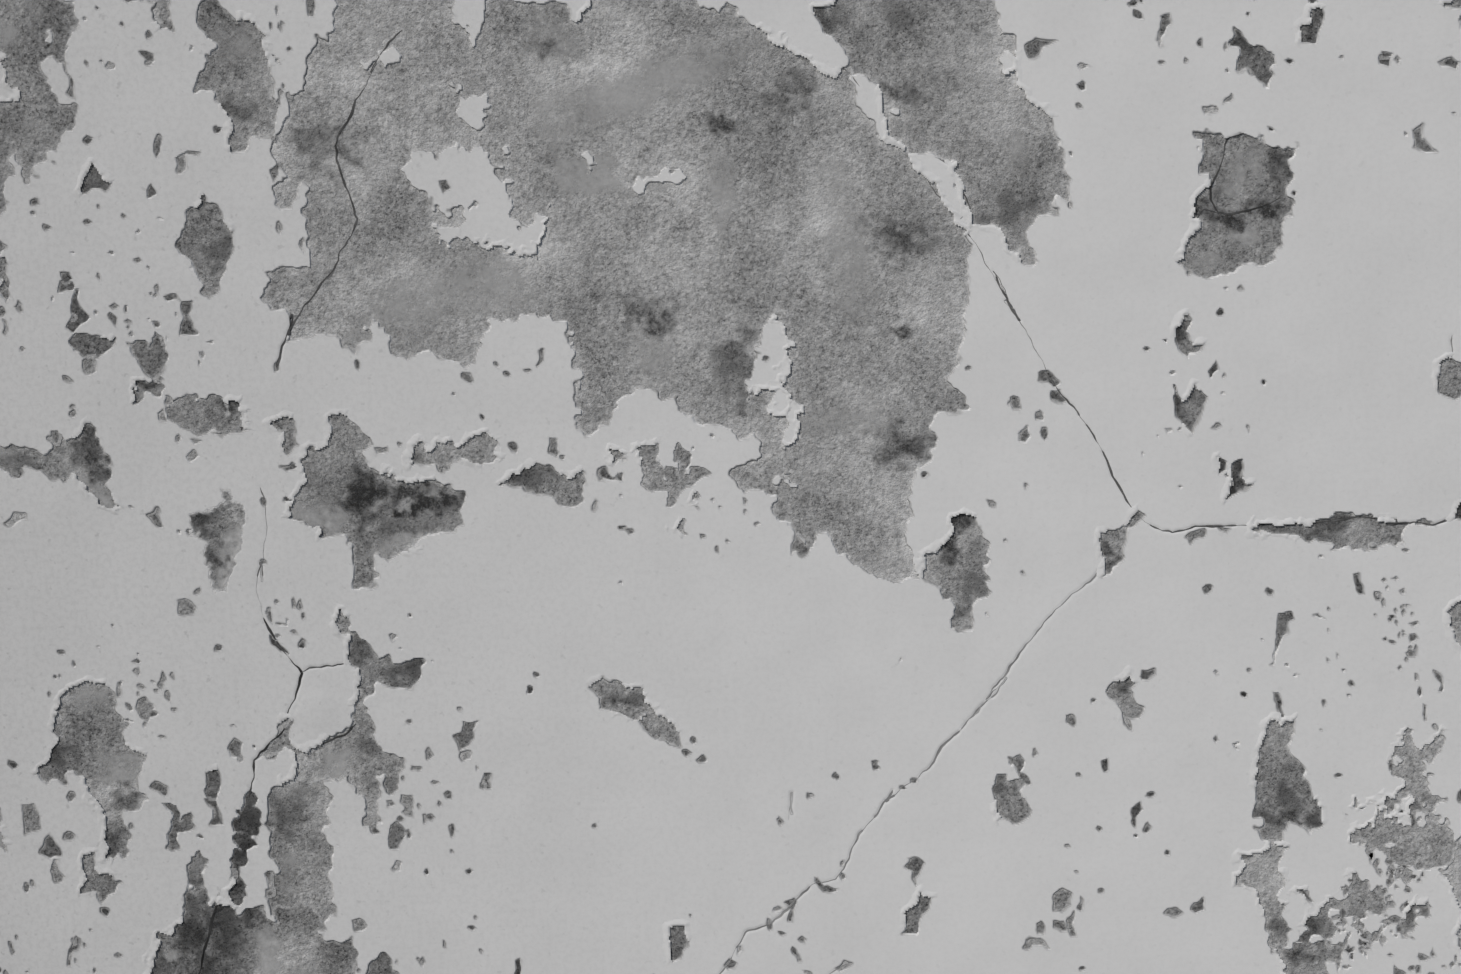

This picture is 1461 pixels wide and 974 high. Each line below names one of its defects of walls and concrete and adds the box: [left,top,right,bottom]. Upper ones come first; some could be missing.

peeling [1224,0,1327,87]
crack [277,30,402,366]
peeling [1173,128,1296,289]
peeling [52,0,1072,631]
crack [894,146,1461,533]
peeling [0,405,266,615]
peeling [1244,499,1461,557]
crack [249,488,344,797]
crack [321,724,356,745]
peeling [586,674,707,762]
crack [719,572,1097,974]
crack [199,903,217,974]